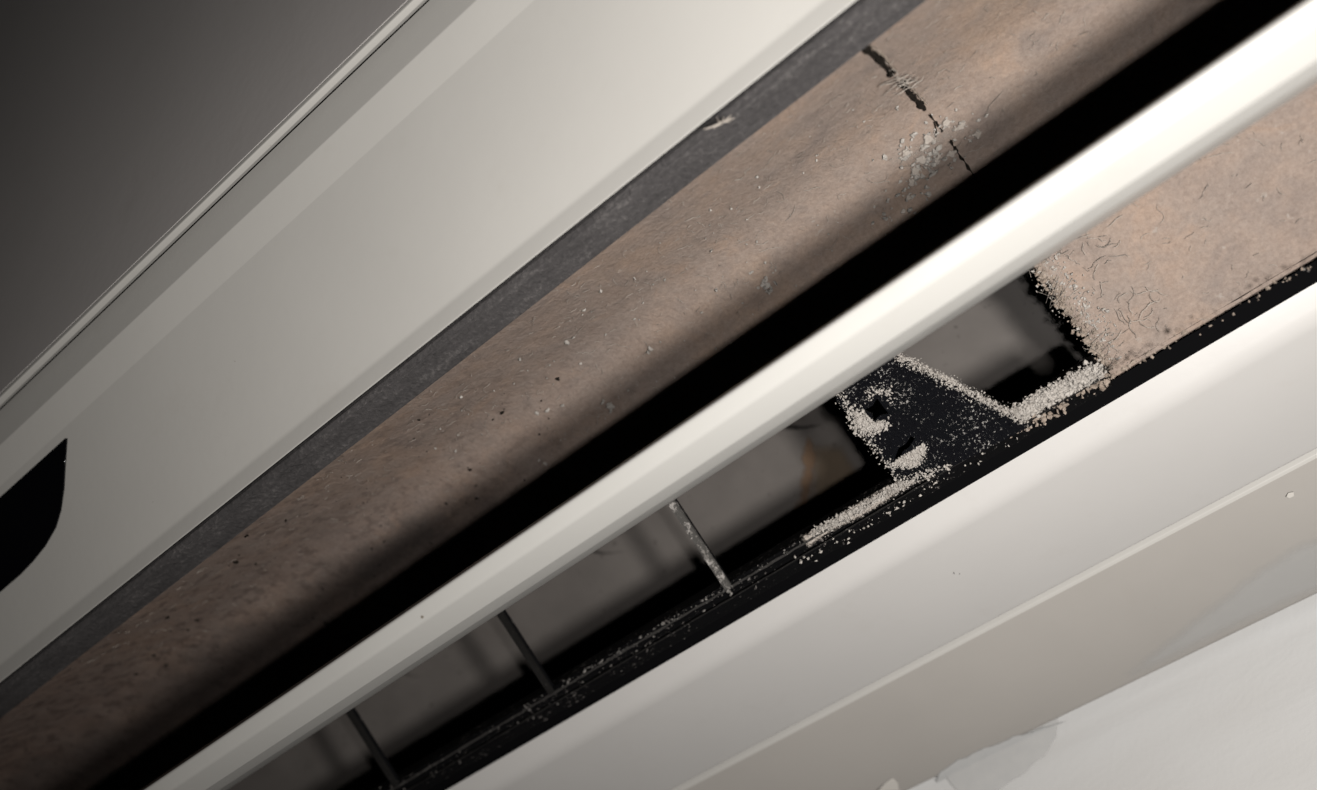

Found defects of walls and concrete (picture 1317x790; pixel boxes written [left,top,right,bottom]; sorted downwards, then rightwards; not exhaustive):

crack [862,45,979,182]
peeling [890,215,1311,447]